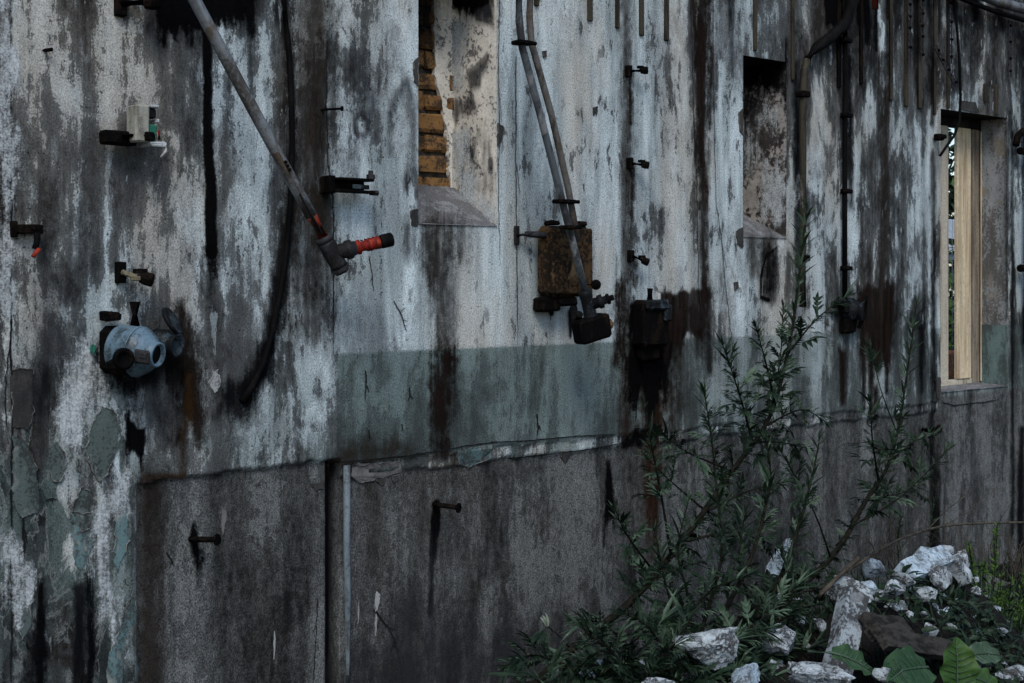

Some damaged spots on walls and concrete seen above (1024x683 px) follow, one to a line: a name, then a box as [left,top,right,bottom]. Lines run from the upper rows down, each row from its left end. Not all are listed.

leakage [223,0,256,38]
flaking render [432,0,504,223]
leakage [613,0,637,367]
leakage [690,0,713,372]
leakage [857,0,891,315]
leakage [36,283,67,413]
peeling [10,340,146,683]
spalling [351,461,401,483]
peeling [457,445,492,468]
spalling [560,450,572,464]
rust [621,288,706,552]
rust [838,279,896,424]